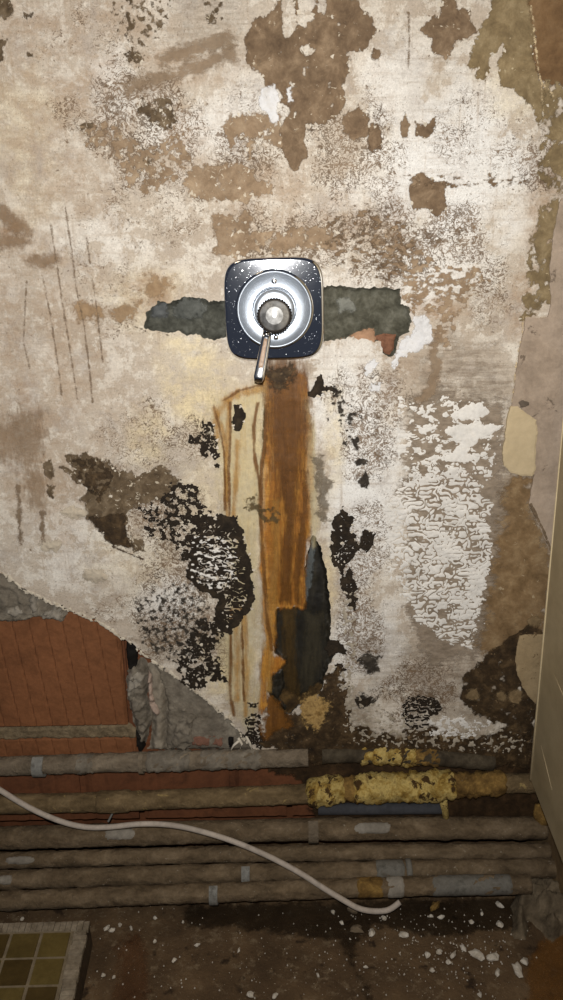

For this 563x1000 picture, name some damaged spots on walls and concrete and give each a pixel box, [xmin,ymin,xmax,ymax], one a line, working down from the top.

peeling [79,0,527,357]
peeling [420,0,563,321]
flaking render [0,572,253,757]
damp [188,421,220,468]
damp [135,479,280,695]
rust [214,360,314,716]
damp [240,455,550,784]
flaking render [267,535,525,755]
damp [307,793,539,818]